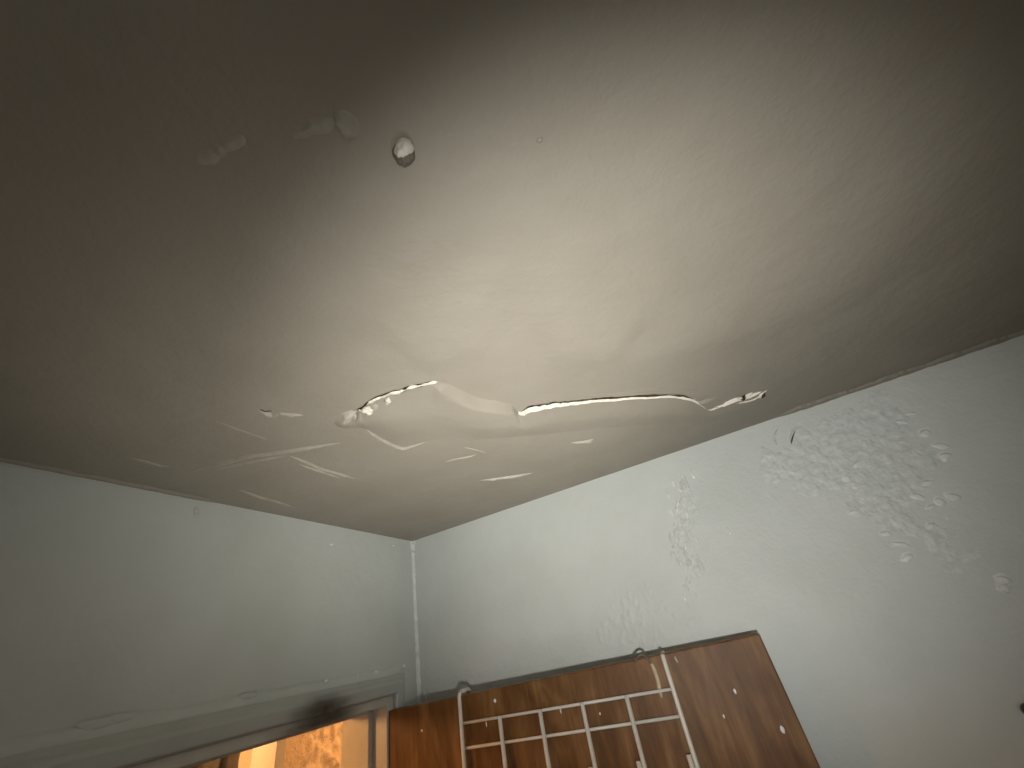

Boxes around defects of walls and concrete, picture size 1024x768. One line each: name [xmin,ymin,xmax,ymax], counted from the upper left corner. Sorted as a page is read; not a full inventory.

spalling [394,137,414,158]
crack [339,381,438,425]
crack [518,388,767,416]